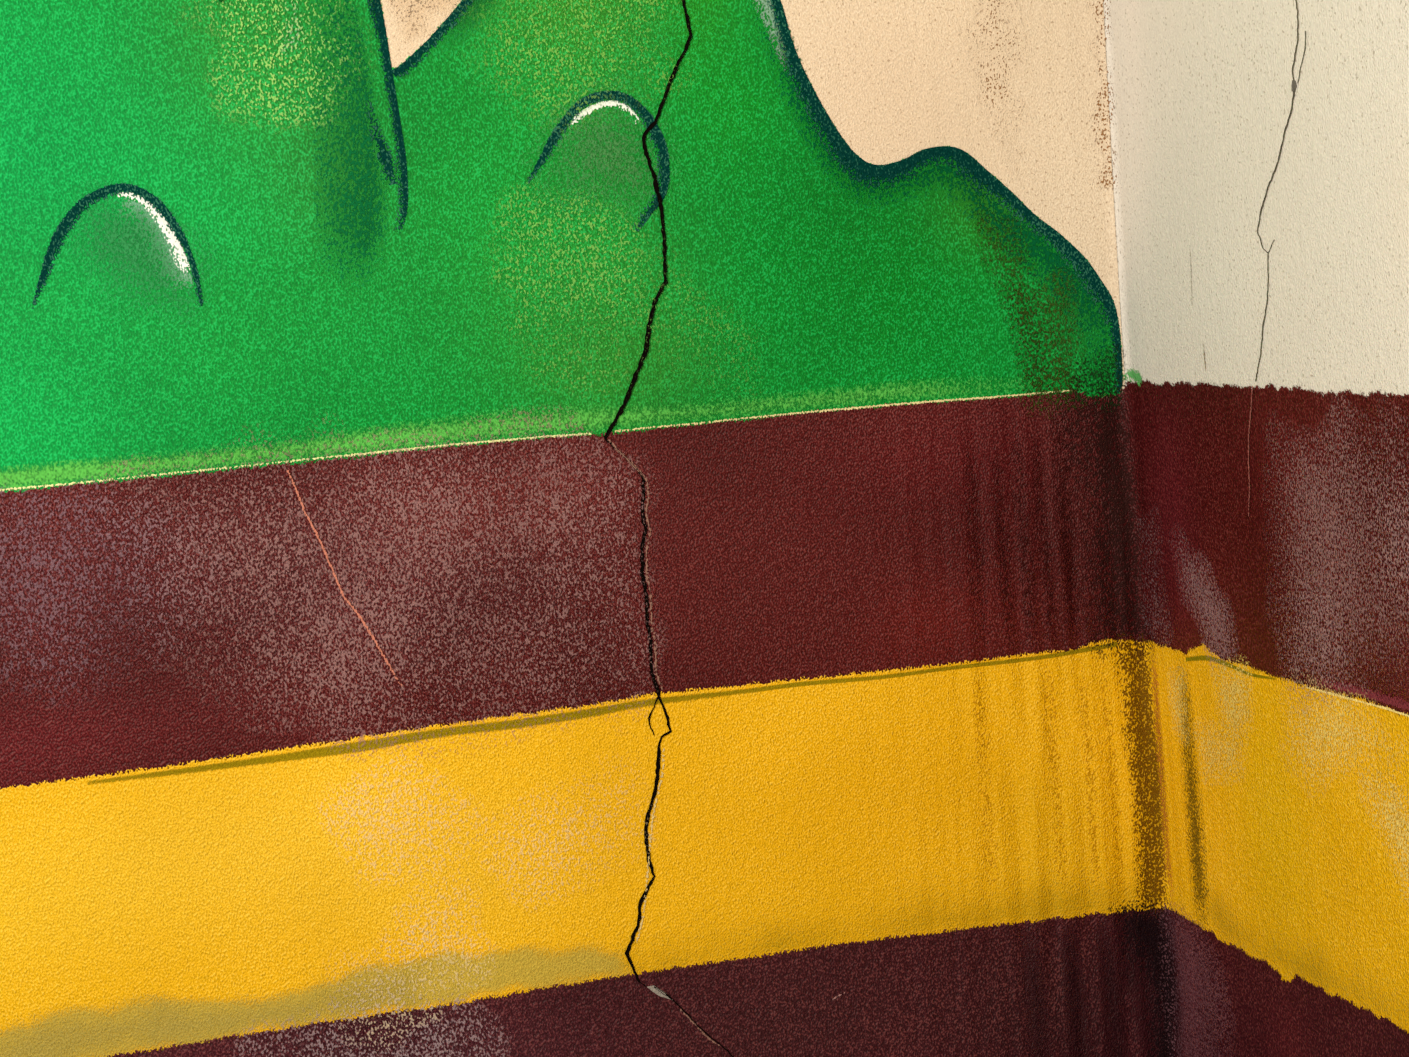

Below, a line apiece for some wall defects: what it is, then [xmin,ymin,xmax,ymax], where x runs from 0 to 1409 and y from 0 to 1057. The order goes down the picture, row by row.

crack [604,0,733,1057]
crack [1248,0,1306,516]